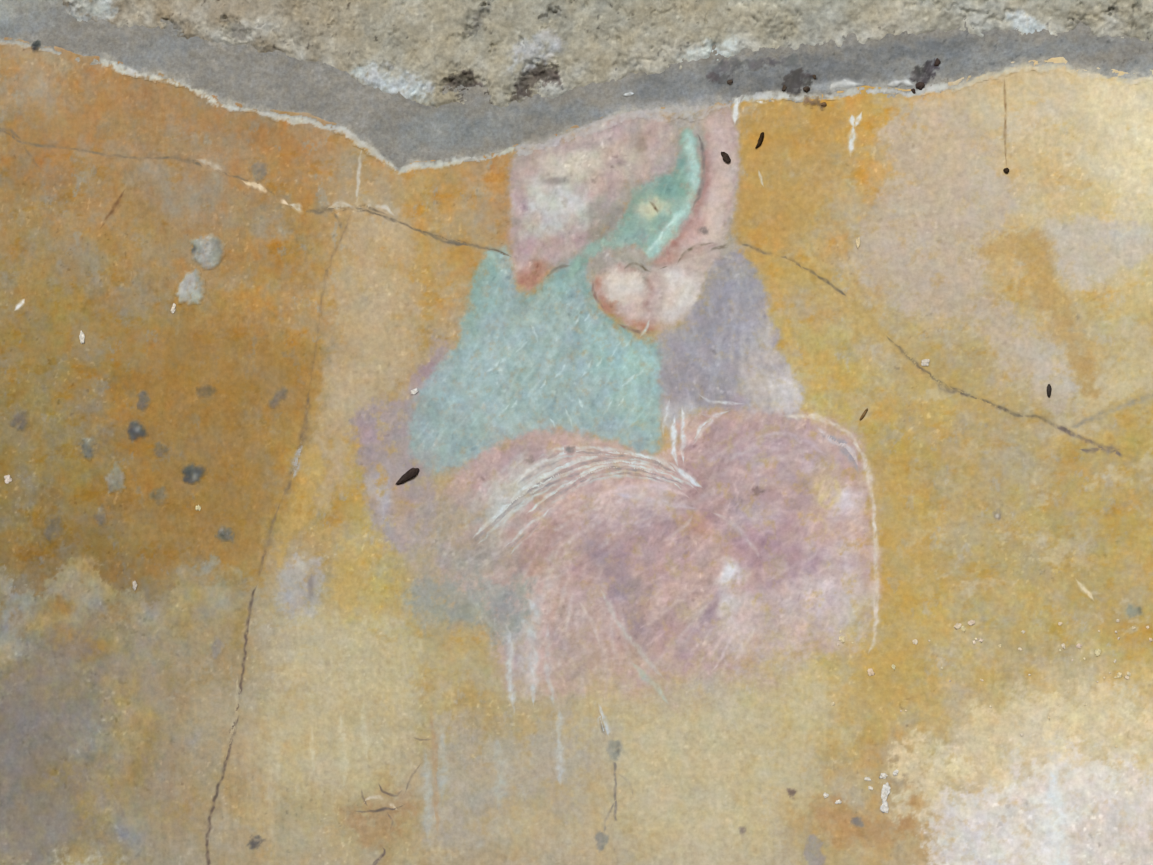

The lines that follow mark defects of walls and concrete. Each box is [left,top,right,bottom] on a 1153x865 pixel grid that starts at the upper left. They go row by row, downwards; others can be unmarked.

peeling [0,39,61,56]
spalling [218,15,275,53]
spalling [462,0,496,42]
spalling [535,4,561,25]
crack [622,239,1153,474]
crack [0,126,514,865]
leakage [596,657,1153,865]